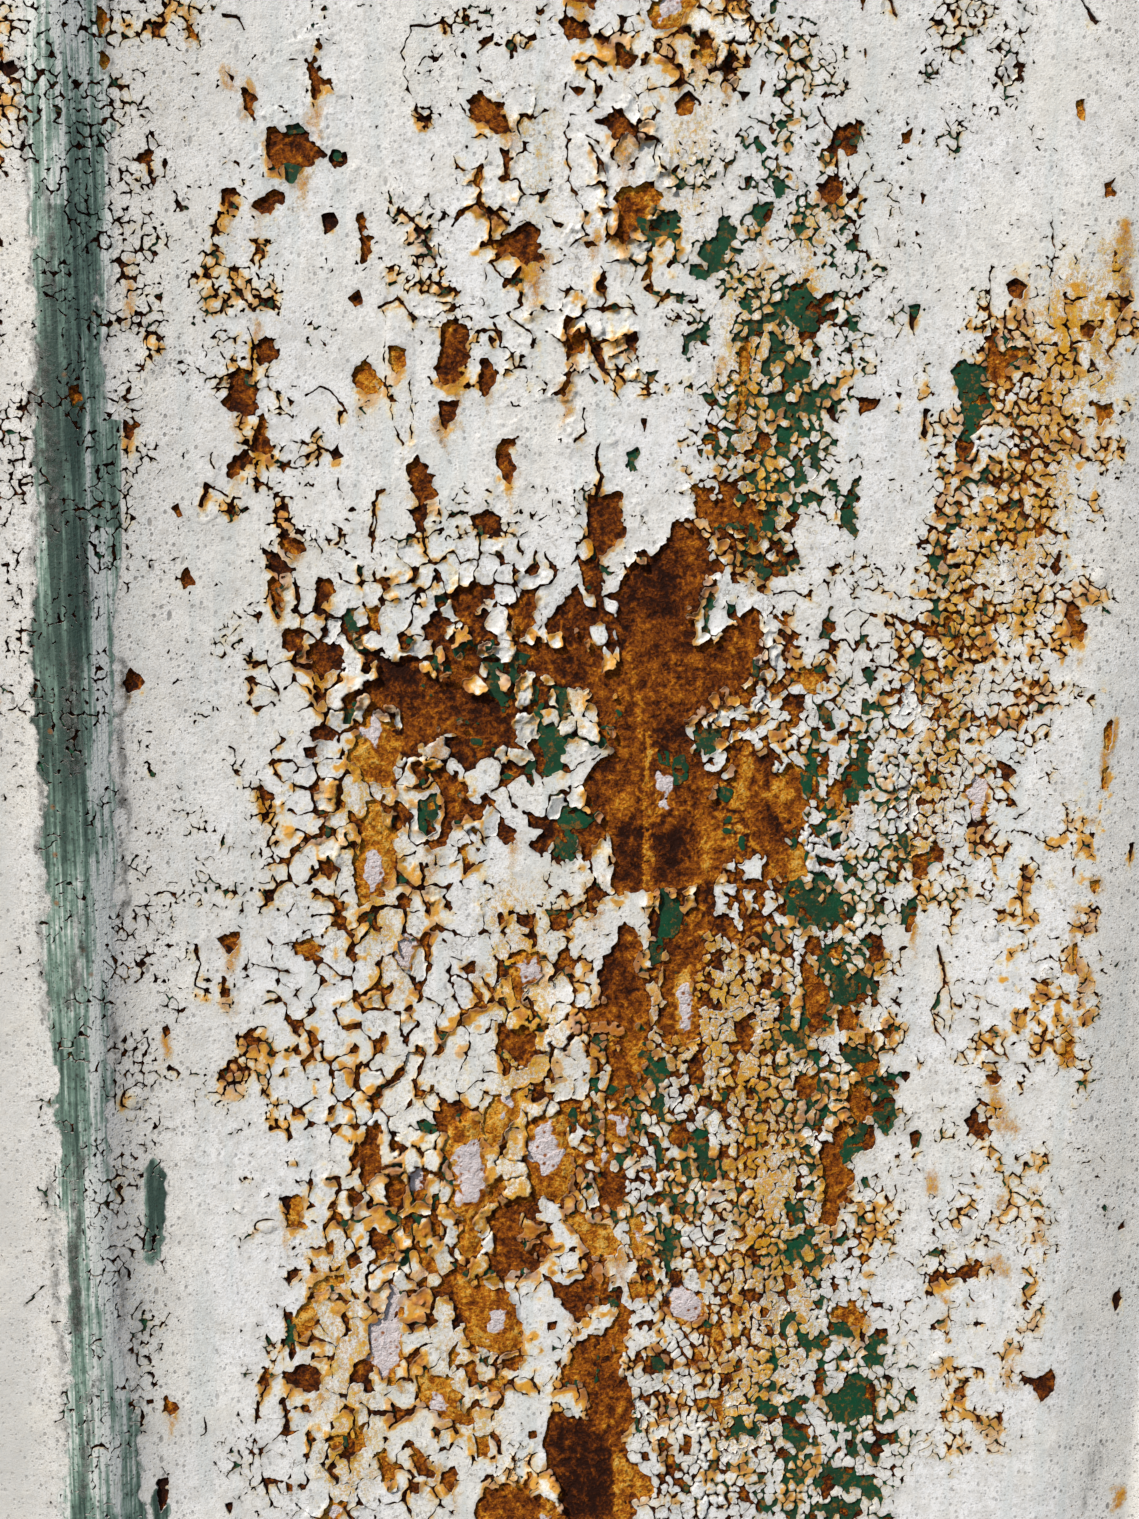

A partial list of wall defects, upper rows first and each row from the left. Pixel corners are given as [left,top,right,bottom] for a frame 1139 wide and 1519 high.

crack [400,17,449,130]
crack [810,103,847,208]
peeling [891,0,1037,168]
rust [796,215,830,286]
peeling [0,0,214,784]
crack [305,385,386,571]
crack [585,335,620,399]
rust [908,219,1133,854]
rust [357,263,826,1519]
peeling [55,1299,180,1488]
rust [303,1241,379,1495]
peeling [438,1341,541,1480]